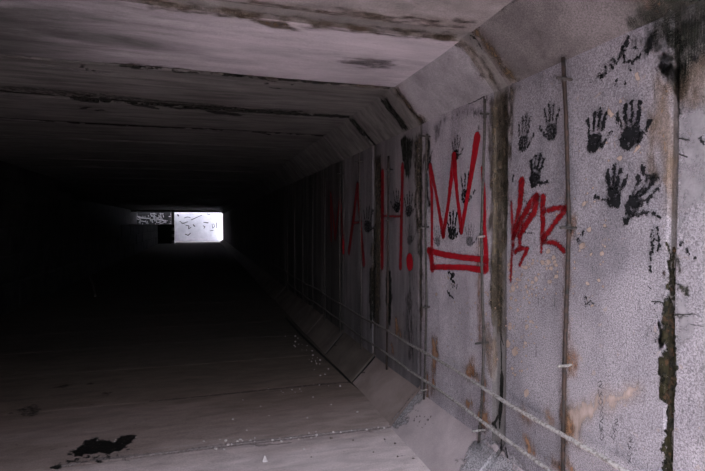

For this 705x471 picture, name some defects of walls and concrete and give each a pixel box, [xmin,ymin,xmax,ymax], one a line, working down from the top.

water stain [144,0,203,14]
water stain [218,1,519,335]
water stain [628,0,705,189]